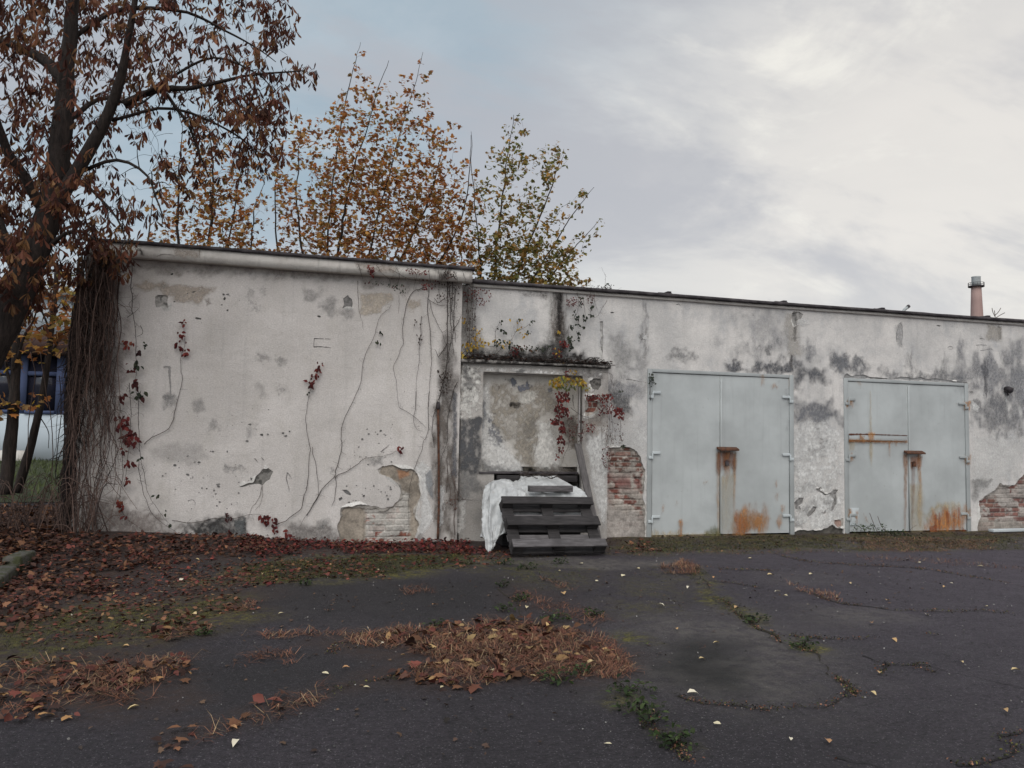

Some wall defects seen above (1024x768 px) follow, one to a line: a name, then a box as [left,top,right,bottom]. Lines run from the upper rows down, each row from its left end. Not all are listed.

water stain [727,315,866,383]
water stain [919,325,1024,429]
water stain [432,285,600,538]
water stain [795,401,837,424]
flaking render [198,464,273,509]
flaking render [337,424,433,543]
flaking render [459,366,647,538]
corrosion [717,451,736,491]
corrosion [734,507,767,535]
corrosion [849,433,921,503]
corrosion [926,504,964,532]
flaking render [977,475,1024,531]